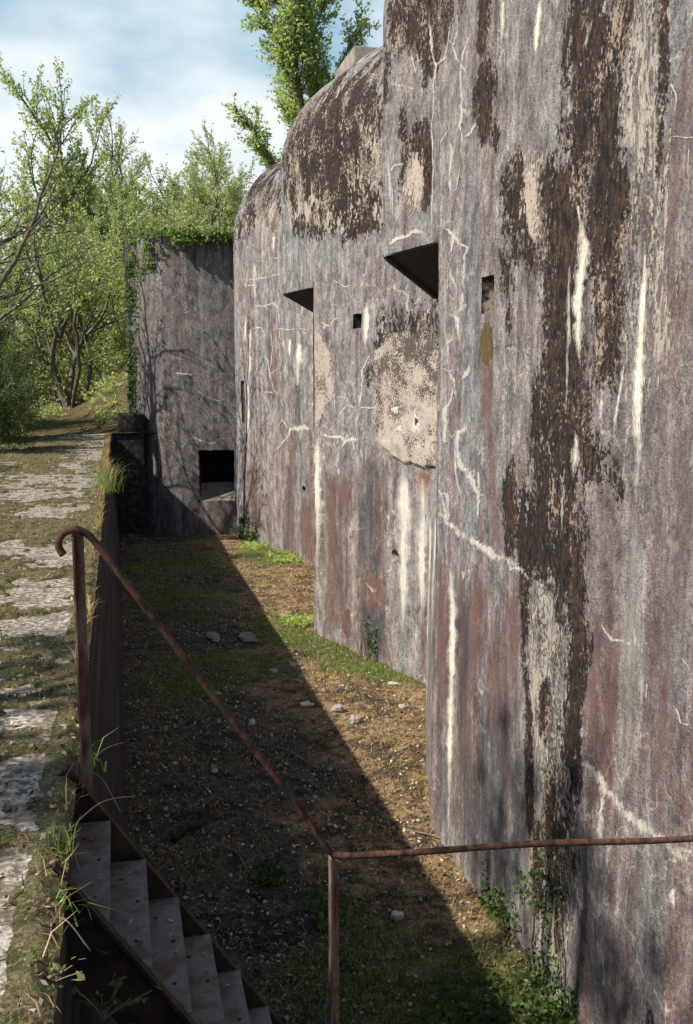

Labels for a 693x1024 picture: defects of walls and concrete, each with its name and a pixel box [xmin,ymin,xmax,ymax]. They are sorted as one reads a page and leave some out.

damp [233,0,646,955]
crack [390,26,528,579]